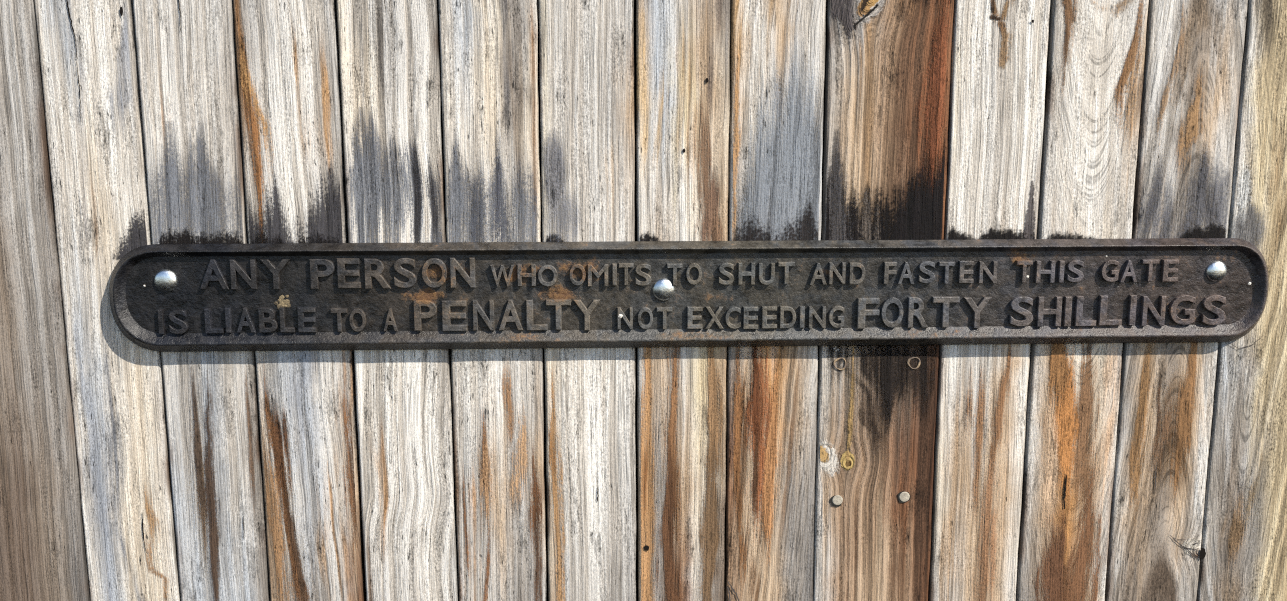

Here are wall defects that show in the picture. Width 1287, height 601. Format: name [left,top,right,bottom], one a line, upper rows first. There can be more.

damp [113,110,580,260]
damp [732,64,946,241]
damp [829,345,936,462]